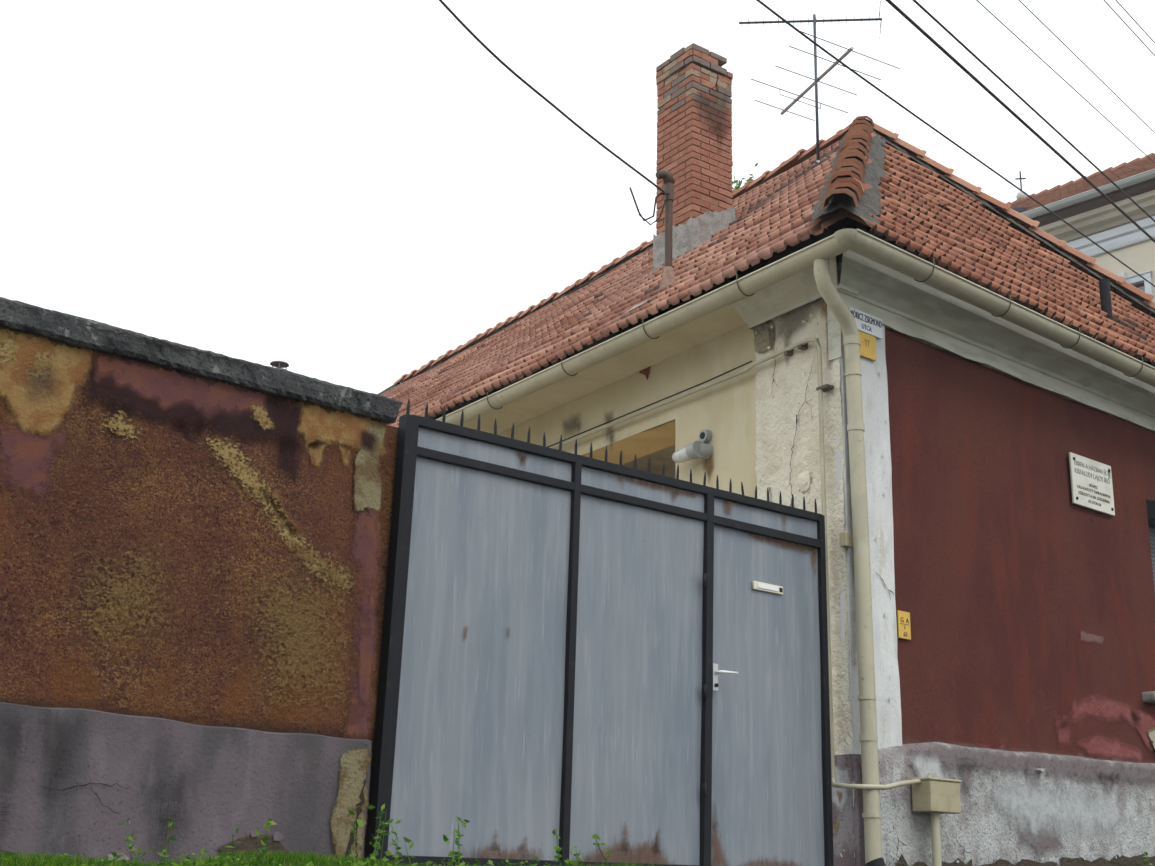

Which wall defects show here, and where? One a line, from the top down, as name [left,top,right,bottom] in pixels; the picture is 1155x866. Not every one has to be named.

spalling [0,327,275,434]
damp [0,417,65,496]
peeling [96,407,146,443]
damp [86,354,357,599]
crack [789,356,815,508]
efflorescence [914,757,942,778]
peeling [915,744,1155,795]
damp [996,782,1128,834]
corrosion [577,831,667,864]